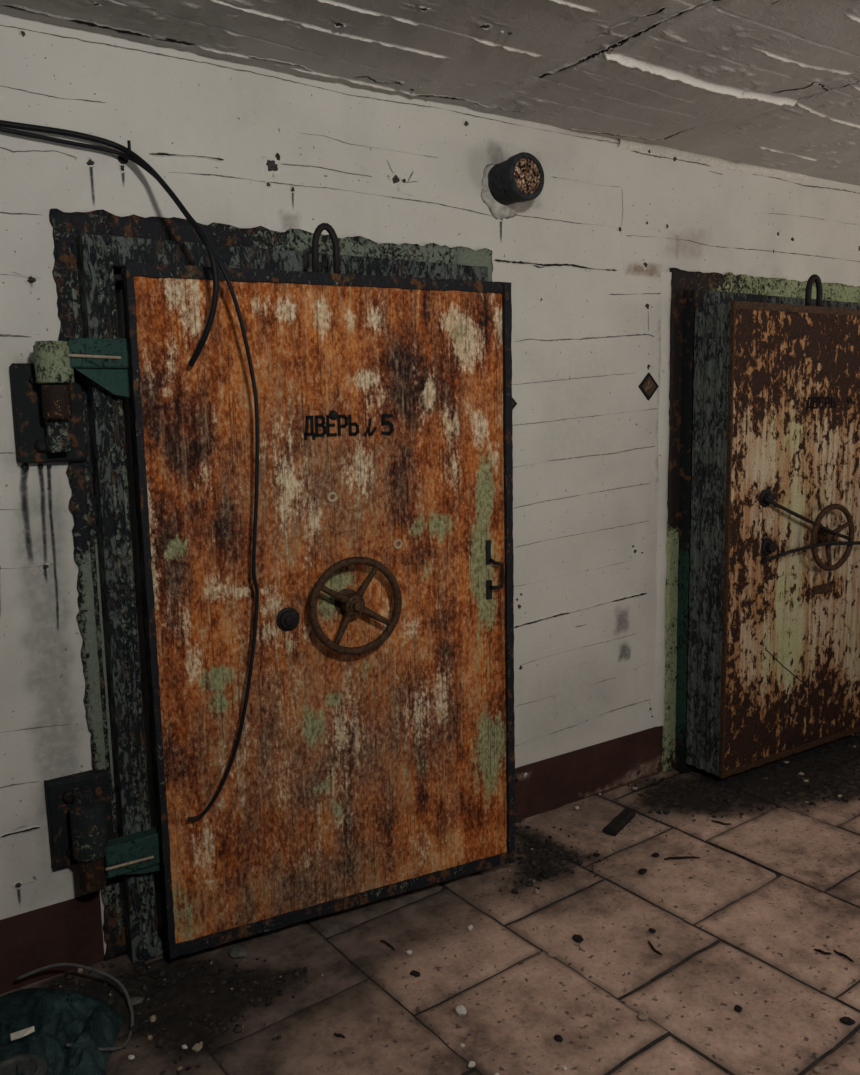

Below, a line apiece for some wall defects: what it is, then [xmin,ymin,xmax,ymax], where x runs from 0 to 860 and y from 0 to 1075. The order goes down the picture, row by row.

crack [0,0,860,194]
crack [0,209,39,217]
crack [513,373,631,385]
crack [513,408,657,426]
crack [513,446,655,468]
crack [515,483,651,508]
damp [20,463,58,624]
crack [515,521,647,548]
crack [514,592,647,665]